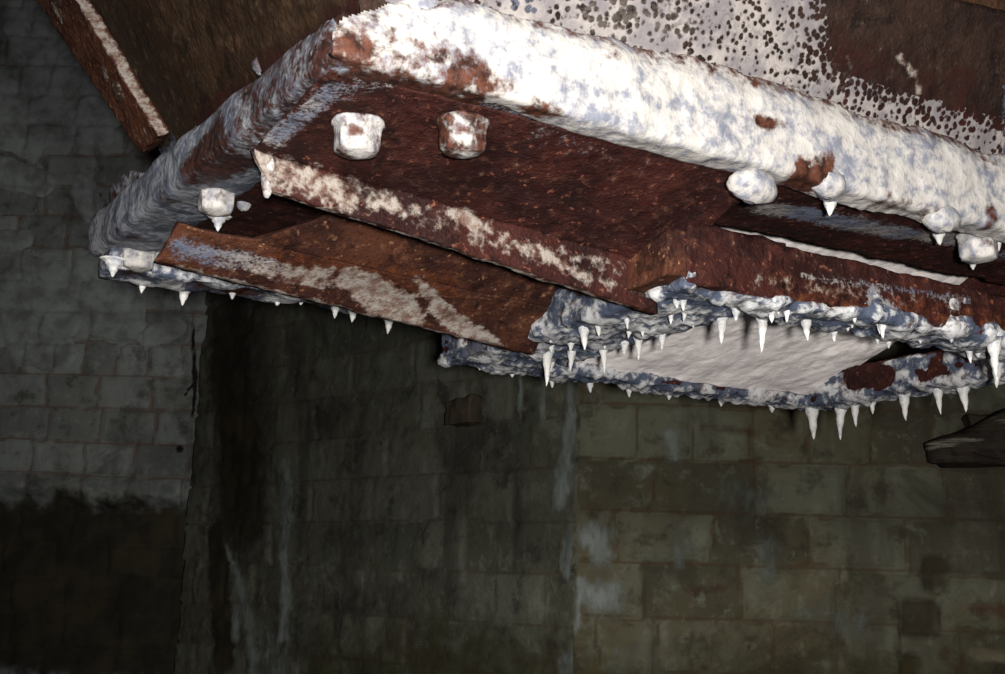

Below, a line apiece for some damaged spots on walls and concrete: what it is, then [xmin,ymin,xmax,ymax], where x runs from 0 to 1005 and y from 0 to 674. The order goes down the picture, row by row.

corrosion [327,0,359,21]
corrosion [196,30,315,125]
corrosion [813,40,1005,154]
water stain [88,0,1005,549]
crack [184,328,198,416]
water stain [0,477,187,674]